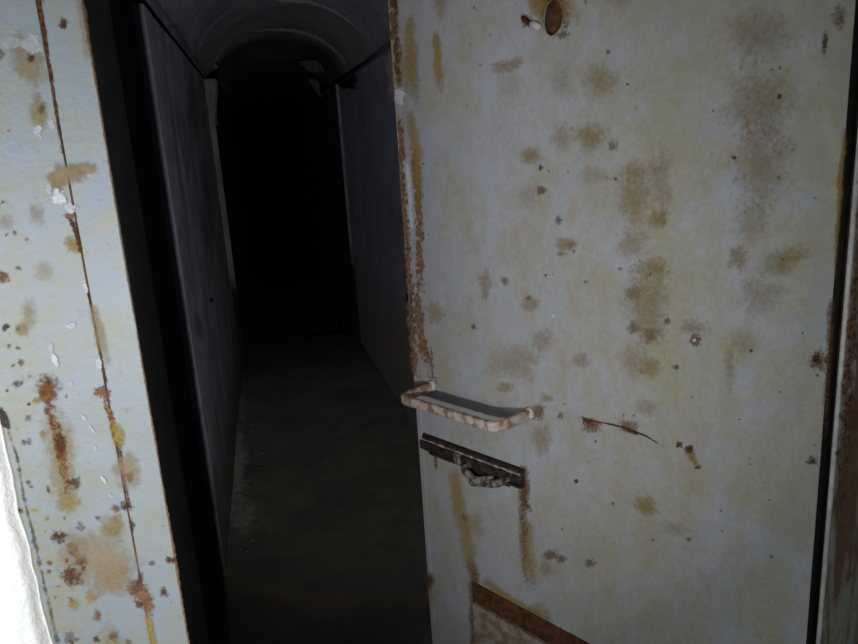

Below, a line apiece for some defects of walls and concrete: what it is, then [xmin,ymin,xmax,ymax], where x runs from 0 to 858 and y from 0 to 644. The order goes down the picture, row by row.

rust [37,0,61,138]
rust [389,0,417,87]
rust [433,35,442,83]
rust [397,116,439,387]
rust [812,303,834,406]
rust [835,237,858,471]
rust [27,377,79,508]
rust [94,386,138,512]
rust [47,532,87,588]
rust [128,574,166,644]
rust [451,474,535,644]
rust [519,466,556,578]